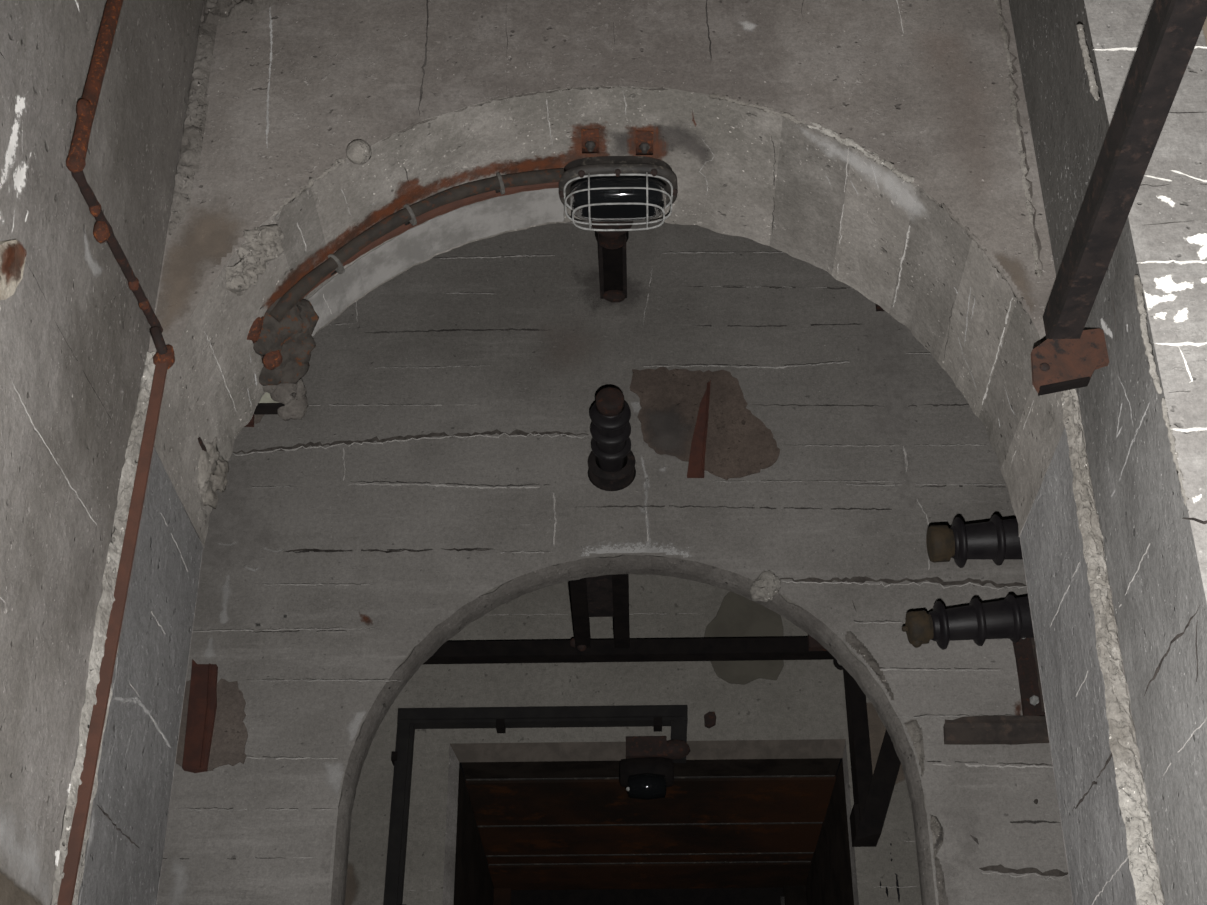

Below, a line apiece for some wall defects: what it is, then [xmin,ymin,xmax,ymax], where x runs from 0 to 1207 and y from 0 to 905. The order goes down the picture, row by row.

peeling [0,95,36,231]
rust [266,123,610,309]
crack [993,0,1043,277]
crack [1182,517,1207,525]